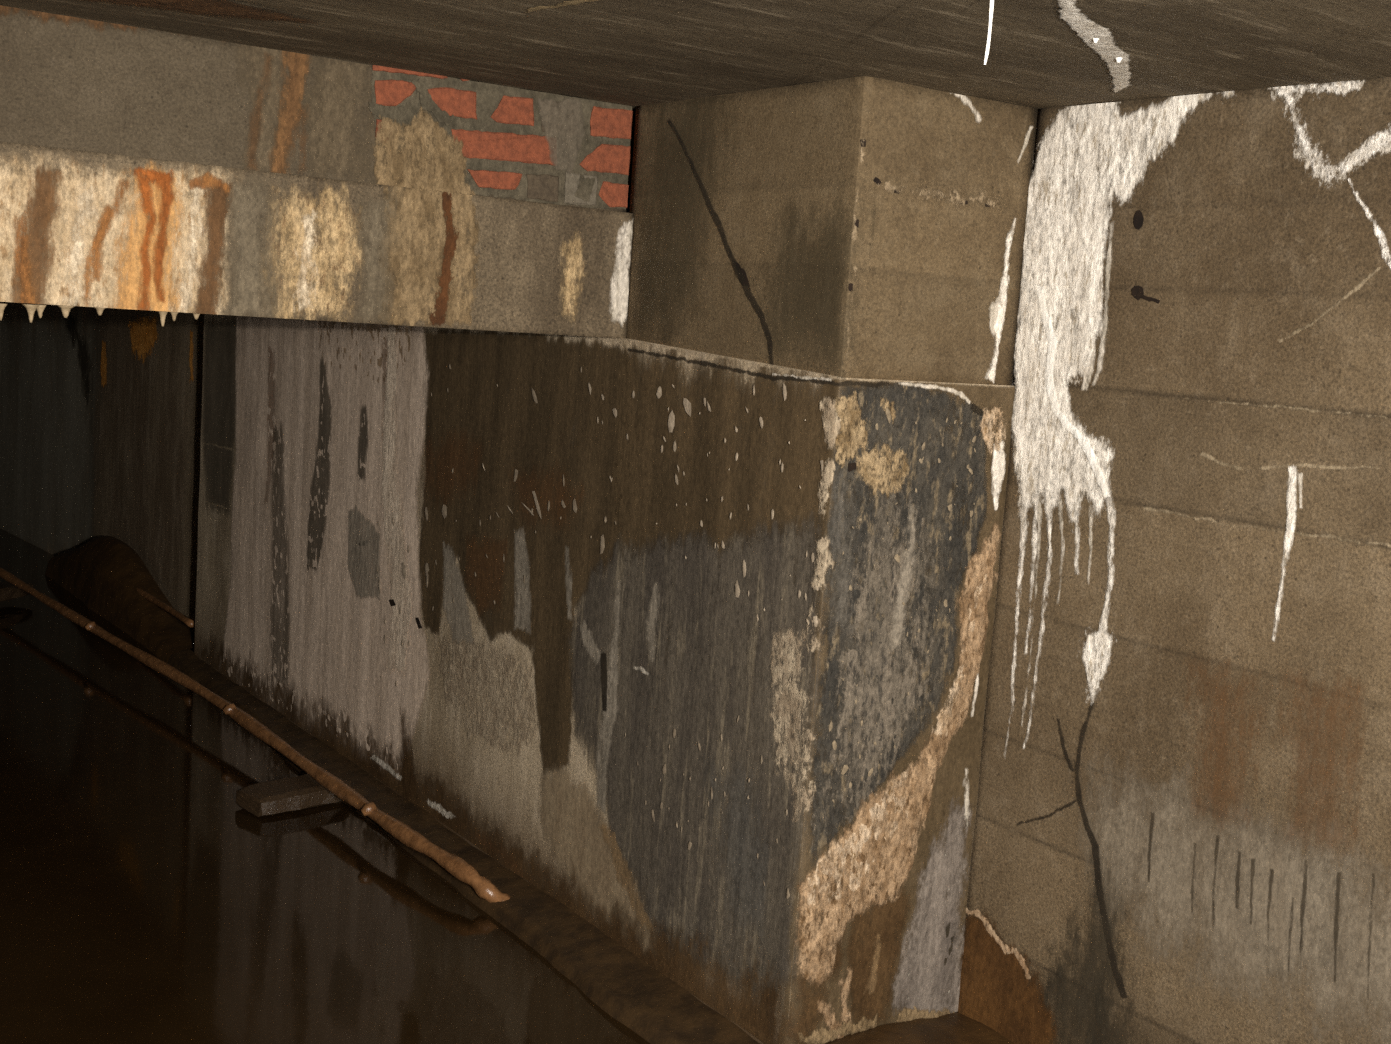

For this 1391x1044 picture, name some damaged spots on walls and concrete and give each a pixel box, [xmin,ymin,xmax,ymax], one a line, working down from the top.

rust [12,168,62,304]
water stain [0,153,156,555]
rust [85,166,231,365]
rust [272,51,308,174]
spalling [369,65,633,210]
crack [628,119,984,415]
crack [1058,0,1131,93]
water stain [1269,81,1391,269]
water stain [164,46,1233,1044]
water stain [1272,463,1366,640]
peeling [565,345,987,1013]
crack [1017,702,1127,998]